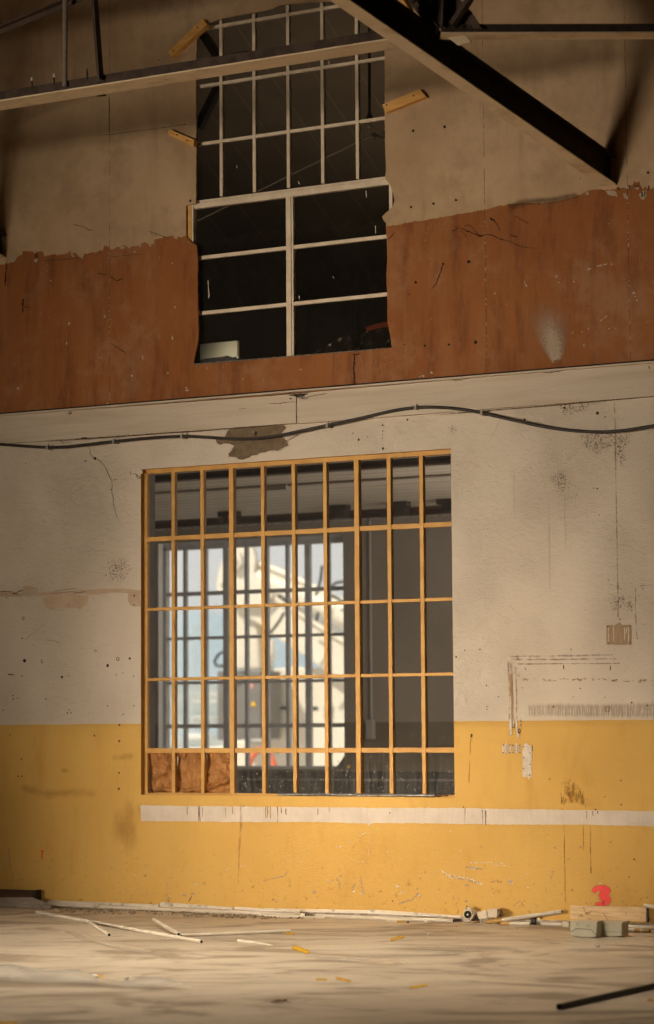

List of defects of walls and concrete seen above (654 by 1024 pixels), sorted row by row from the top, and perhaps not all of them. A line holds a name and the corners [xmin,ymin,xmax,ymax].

crack [453,216,531,248]
flaking render [214,425,299,462]